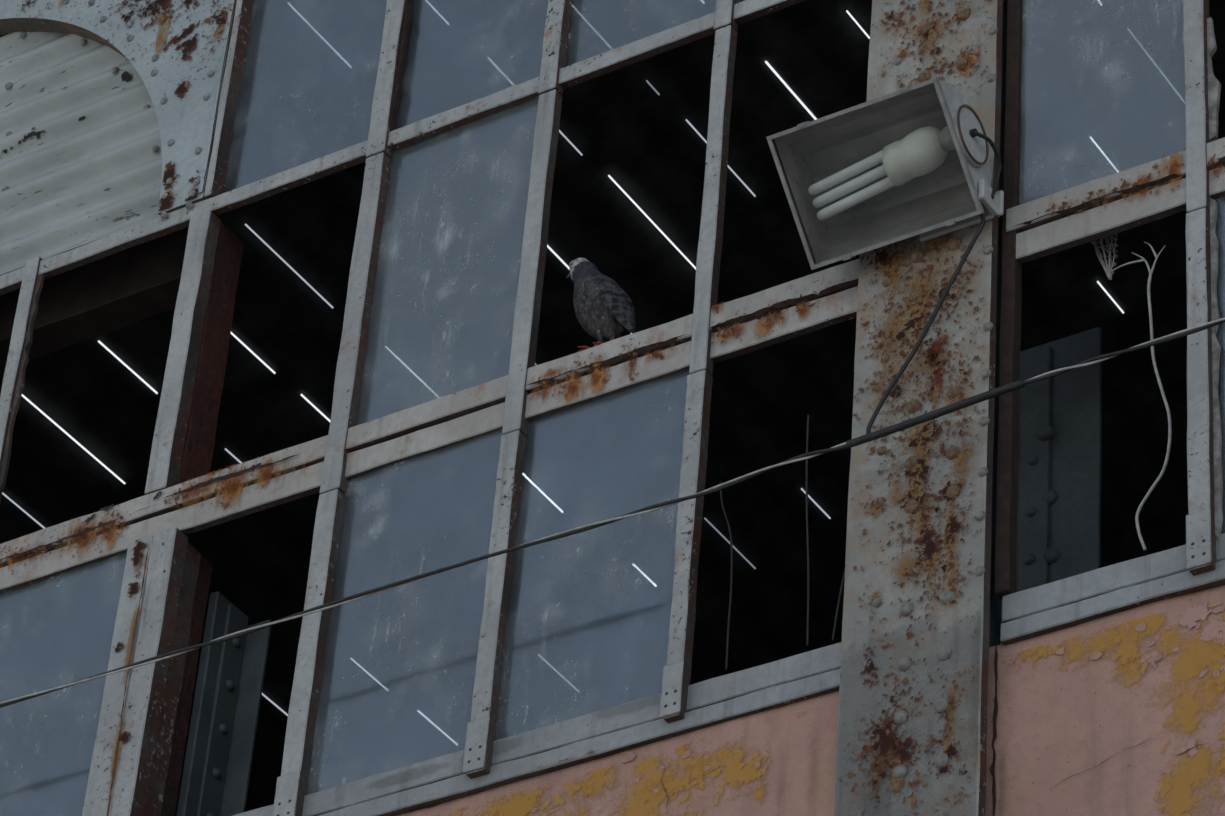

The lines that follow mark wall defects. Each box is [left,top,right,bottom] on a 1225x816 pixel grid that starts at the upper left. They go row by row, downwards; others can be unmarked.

corrosion [98,0,235,60]
corrosion [872,0,995,102]
corrosion [158,160,199,211]
corrosion [1037,154,1184,217]
corrosion [527,338,677,402]
corrosion [164,456,279,512]
corrosion [838,226,989,816]
corrosion [1,504,147,679]
corrosion [110,716,131,785]
peeling [432,738,769,816]
crack [989,640,1000,816]
peeling [1010,601,1225,816]